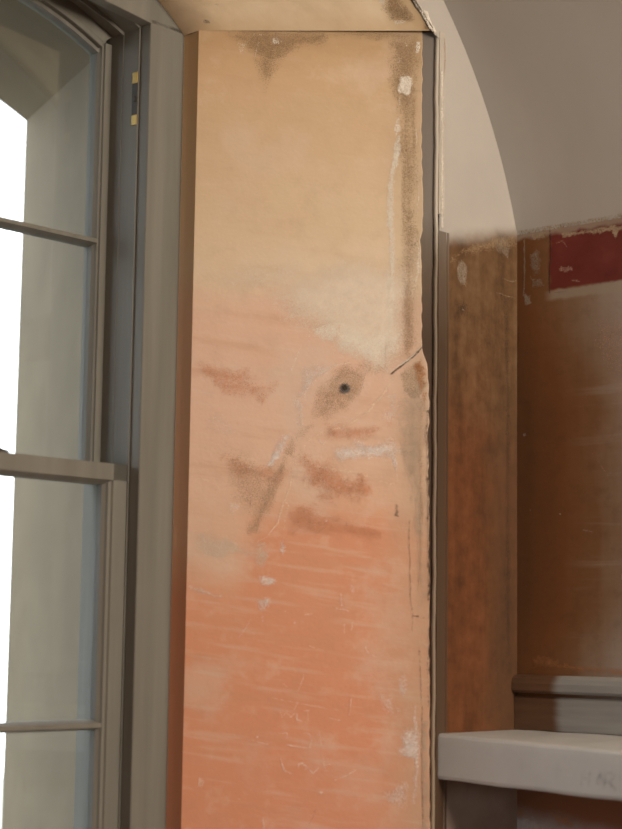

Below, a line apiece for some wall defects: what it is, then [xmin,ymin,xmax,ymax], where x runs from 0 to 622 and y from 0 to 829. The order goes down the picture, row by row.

leakage [381,0,414,22]
leakage [228,31,422,360]
peeling [557,224,622,247]
leakage [193,362,384,586]